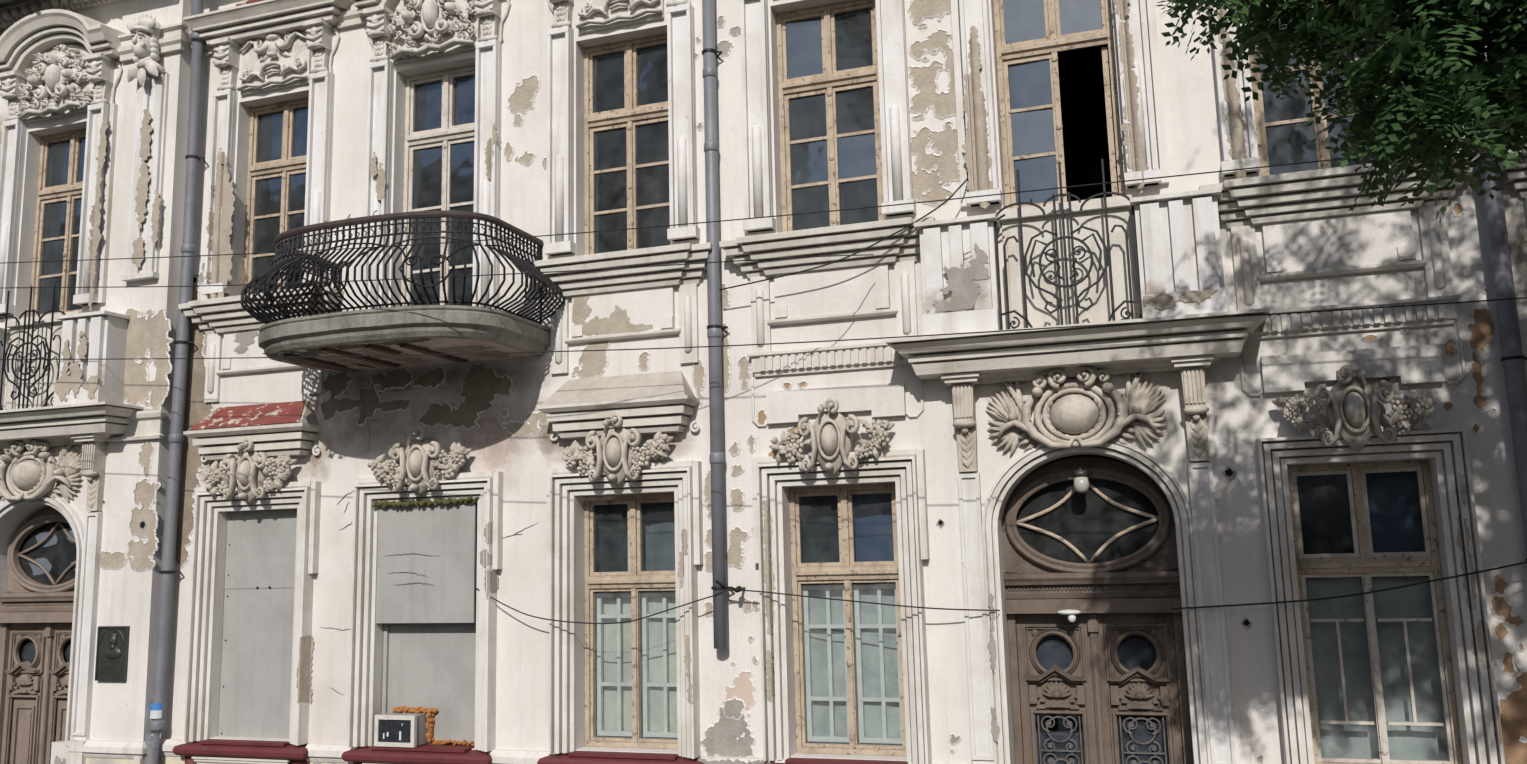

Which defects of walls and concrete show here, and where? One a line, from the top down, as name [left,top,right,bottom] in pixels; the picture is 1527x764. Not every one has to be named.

peeling [131,108,162,267]
peeling [484,74,547,180]
peeling [907,0,993,208]
peeling [123,307,173,410]
peeling [234,329,550,439]
peeling [571,294,653,379]
peeling [692,283,752,406]
peeling [783,380,808,390]
peeling [1441,287,1498,435]
peeling [99,441,161,572]
flaking render [678,408,783,764]
flaking render [1454,472,1527,764]